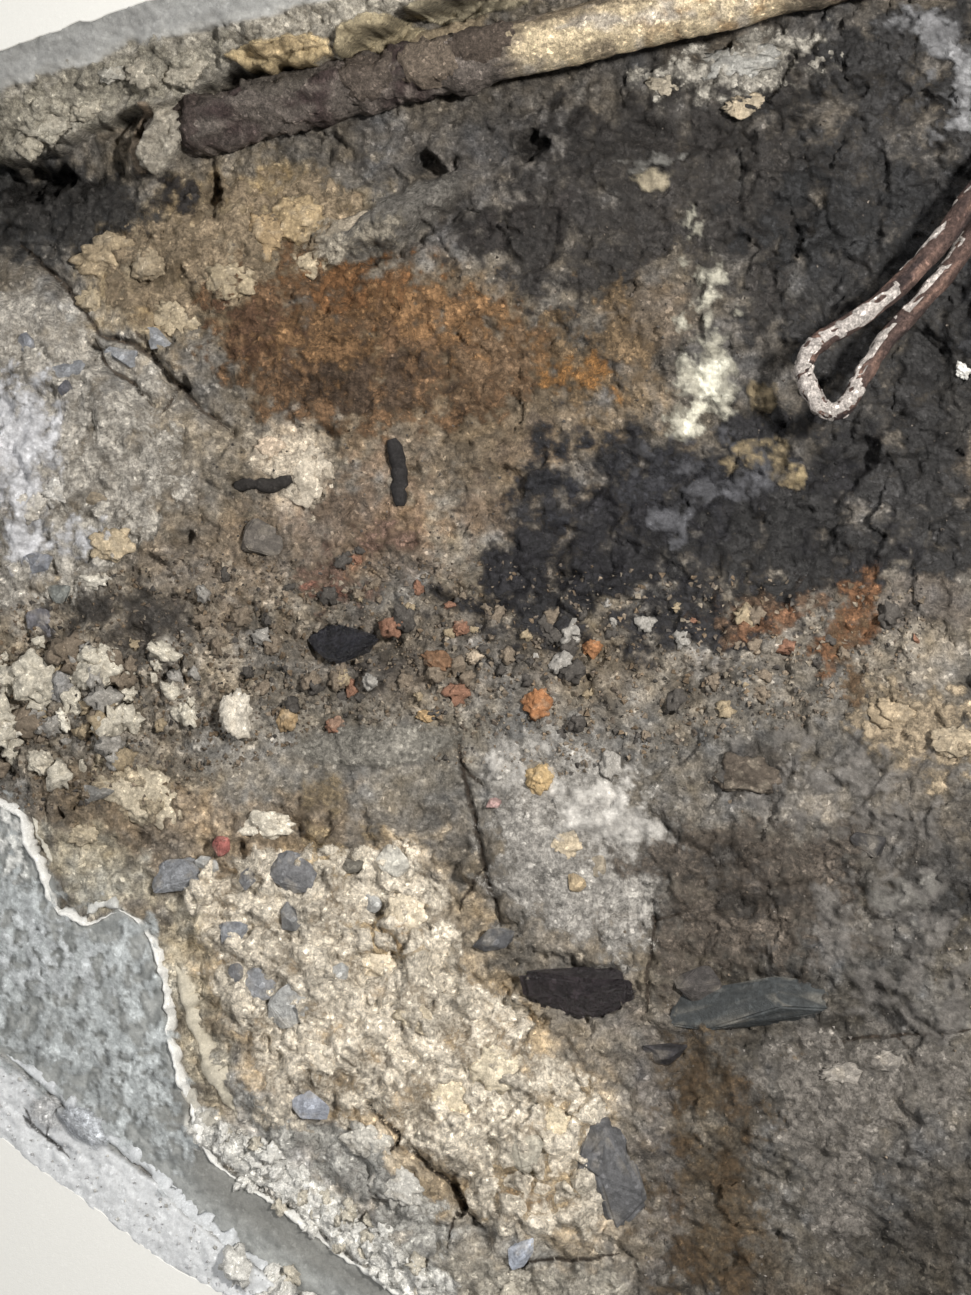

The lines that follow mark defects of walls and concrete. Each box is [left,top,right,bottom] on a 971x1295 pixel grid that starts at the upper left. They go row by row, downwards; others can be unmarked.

spalling [0,0,528,176]
spalling [626,26,844,120]
spalling [0,169,368,637]
corrosion [192,241,654,443]
leakage [430,0,971,668]
peeling [793,221,965,421]
spalling [84,753,184,832]
spalling [472,710,670,974]
leakage [485,731,971,1044]
spalling [841,672,971,795]
spalling [0,798,630,1295]
spalling [738,1005,971,1273]